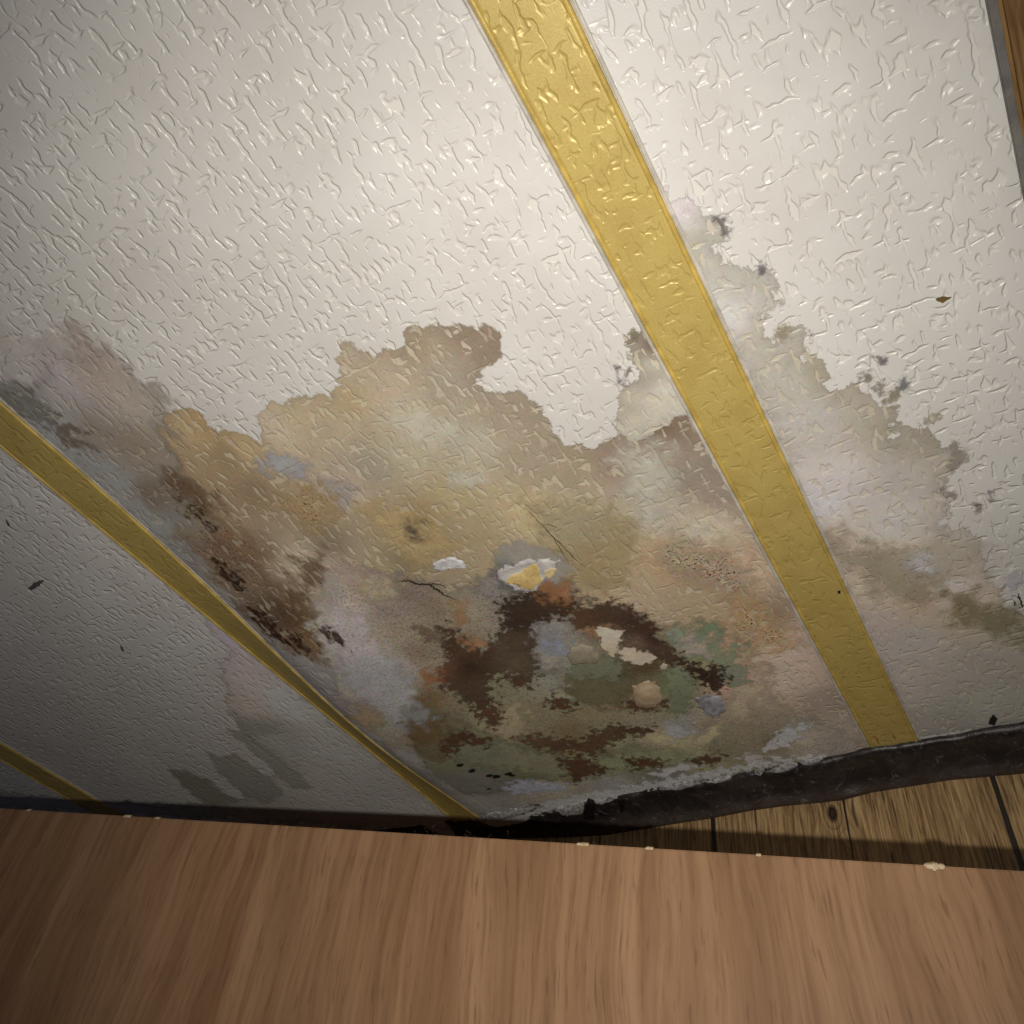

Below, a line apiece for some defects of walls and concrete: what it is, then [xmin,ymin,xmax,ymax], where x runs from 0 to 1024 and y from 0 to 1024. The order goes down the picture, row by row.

crack [398,580,456,600]
water stain [0,321,867,830]
spalling [305,557,859,822]
water stain [658,185,1024,737]